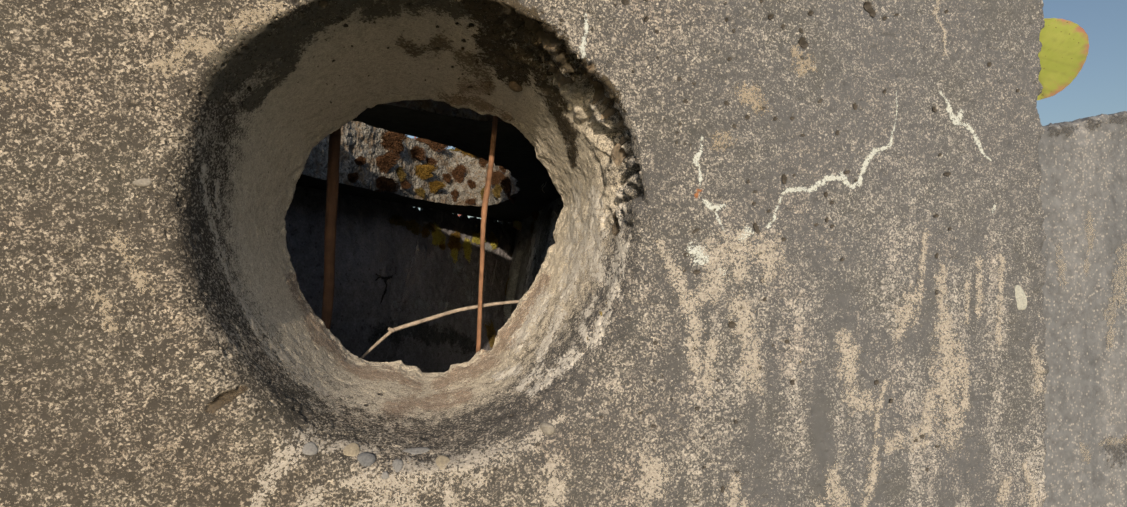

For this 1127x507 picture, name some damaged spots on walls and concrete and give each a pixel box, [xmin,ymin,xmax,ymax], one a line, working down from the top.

damp [395,31,497,87]
crack [692,136,726,233]
crack [766,92,898,229]
crack [939,91,992,161]
damp [654,223,793,398]
damp [810,228,1006,507]
damp [1030,345,1046,396]
damp [637,451,674,507]
damp [724,473,748,507]
damp [996,459,1042,507]